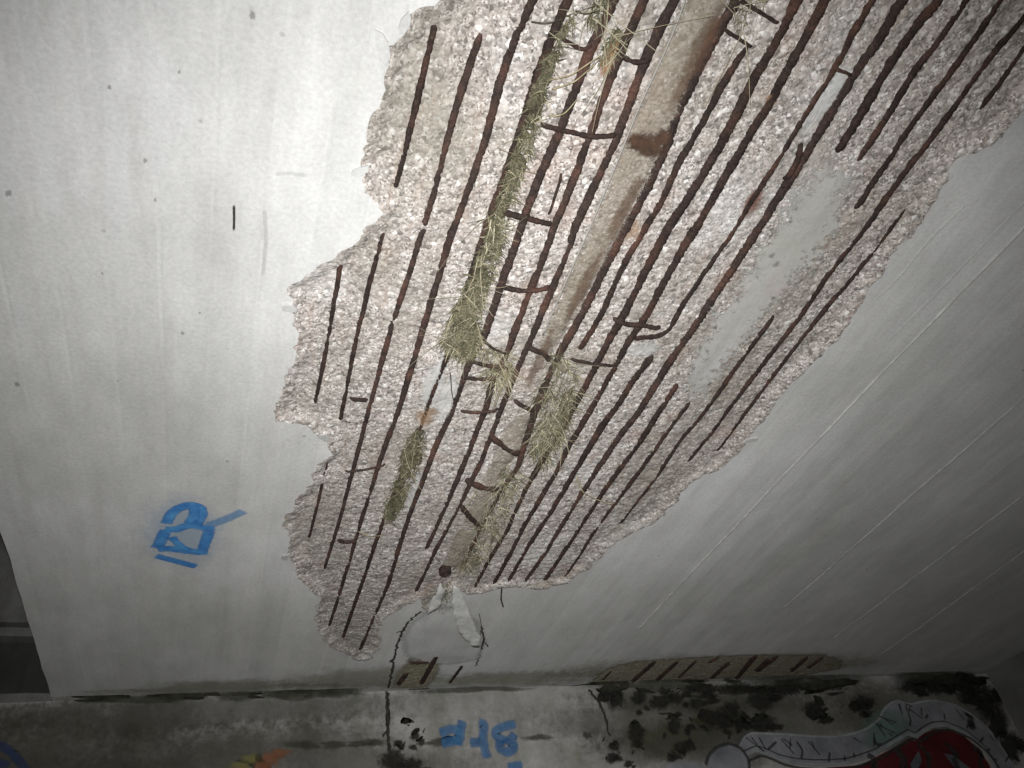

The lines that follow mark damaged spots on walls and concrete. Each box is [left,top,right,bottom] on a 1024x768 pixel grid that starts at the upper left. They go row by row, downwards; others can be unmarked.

rust [627,128,671,157]
rust [611,183,639,238]
rust [568,259,598,316]
spalling [273,0,1024,661]
damp [86,692,206,703]
damp [223,689,356,701]
crack [382,611,422,751]
spalling [394,658,440,688]
spalling [593,654,842,682]
damp [584,675,874,768]
damp [898,671,1024,764]